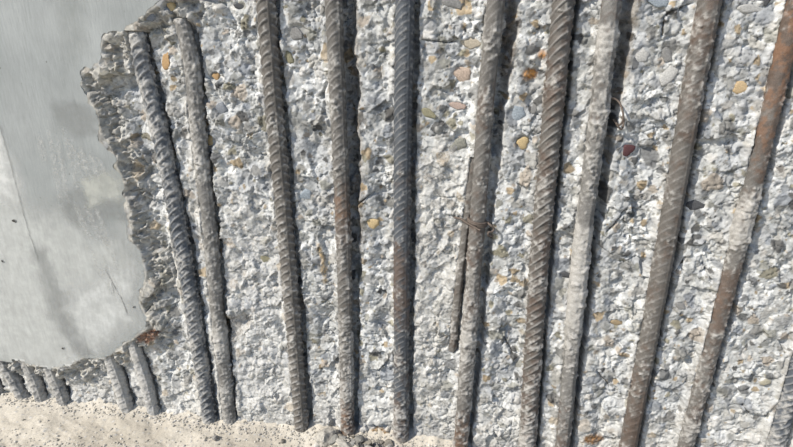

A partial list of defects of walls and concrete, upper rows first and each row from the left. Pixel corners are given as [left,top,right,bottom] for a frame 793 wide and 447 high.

spalling [0,0,396,436]
spalling [392,0,793,447]